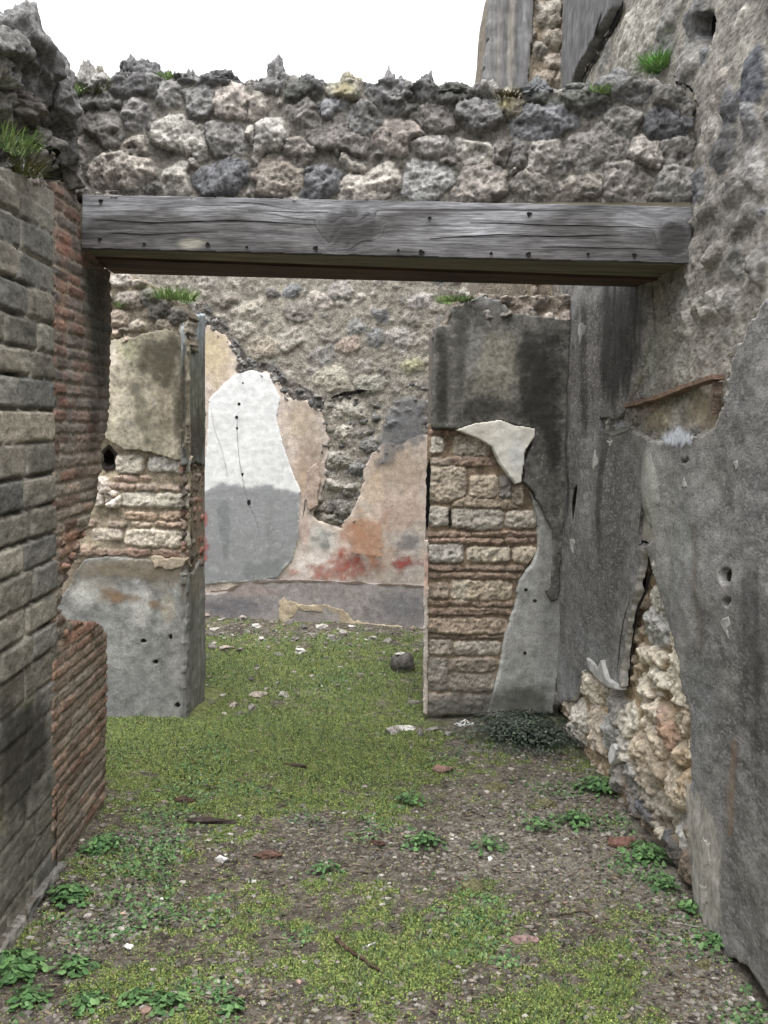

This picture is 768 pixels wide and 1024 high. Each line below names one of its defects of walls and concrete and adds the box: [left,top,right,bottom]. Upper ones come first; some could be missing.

damp [438,334,447,420]
damp [464,329,586,467]
damp [600,286,640,403]
spalling [60,439,193,570]
spalling [195,302,537,727]
spalling [558,556,722,933]